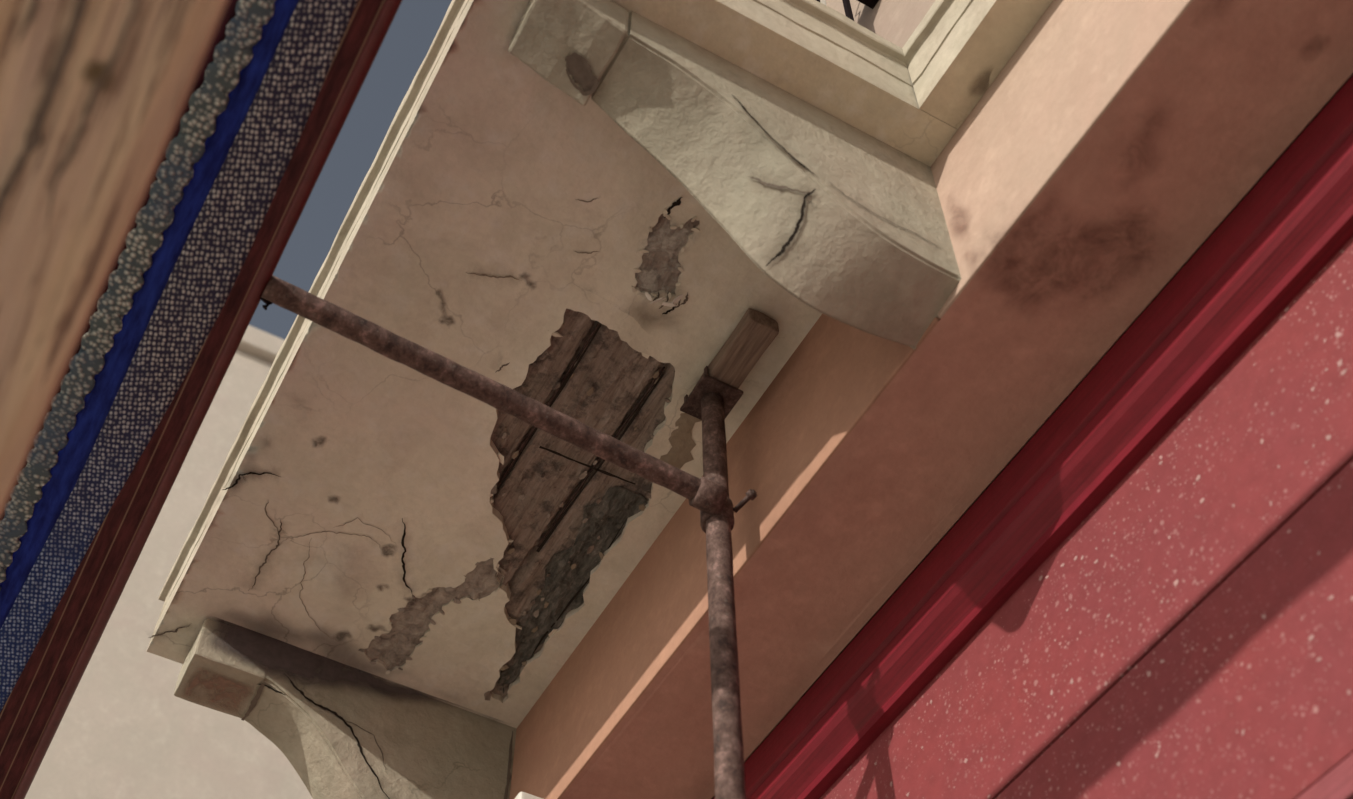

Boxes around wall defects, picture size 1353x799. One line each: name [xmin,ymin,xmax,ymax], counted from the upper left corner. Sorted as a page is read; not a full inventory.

spalling [565,52,599,96]
crack [734,97,941,266]
crack [466,272,519,280]
spalling [631,197,700,314]
spalling [513,308,702,469]
crack [222,472,413,643]
spalling [358,410,653,701]
water stain [214,620,443,700]
crack [241,674,390,799]